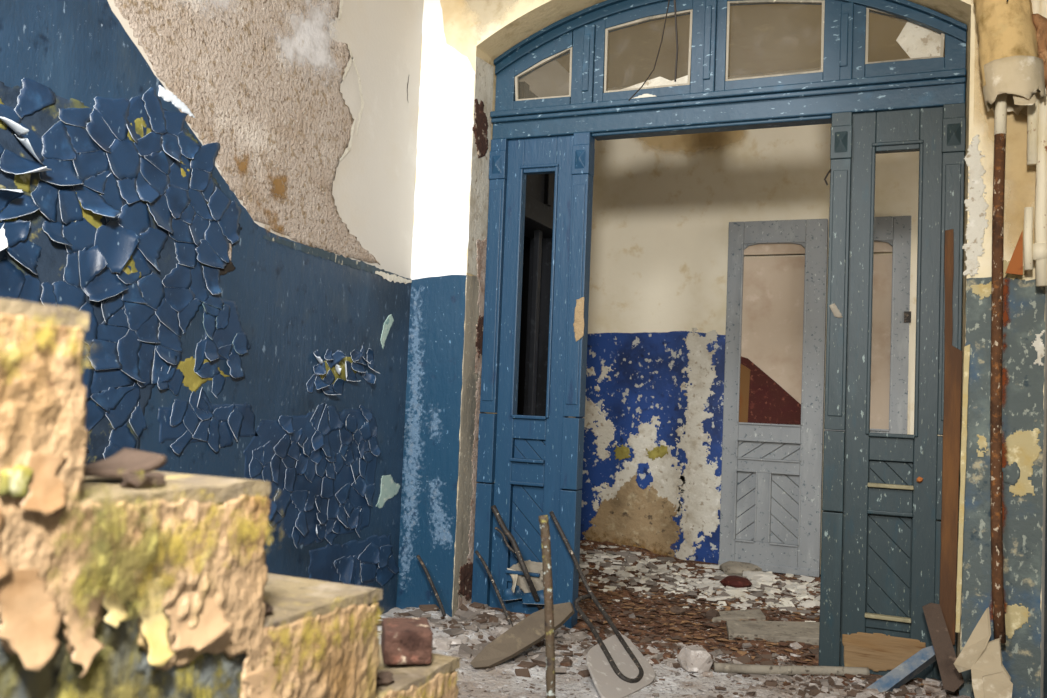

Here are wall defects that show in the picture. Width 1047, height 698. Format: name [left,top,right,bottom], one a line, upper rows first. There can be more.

flaking render [472,99,489,158]
peeling [962,135,1026,300]
peeling [0,0,459,698]
flaking render [458,238,487,601]
peeling [579,328,820,622]
peeling [1002,428,1042,497]
peeling [502,560,544,605]